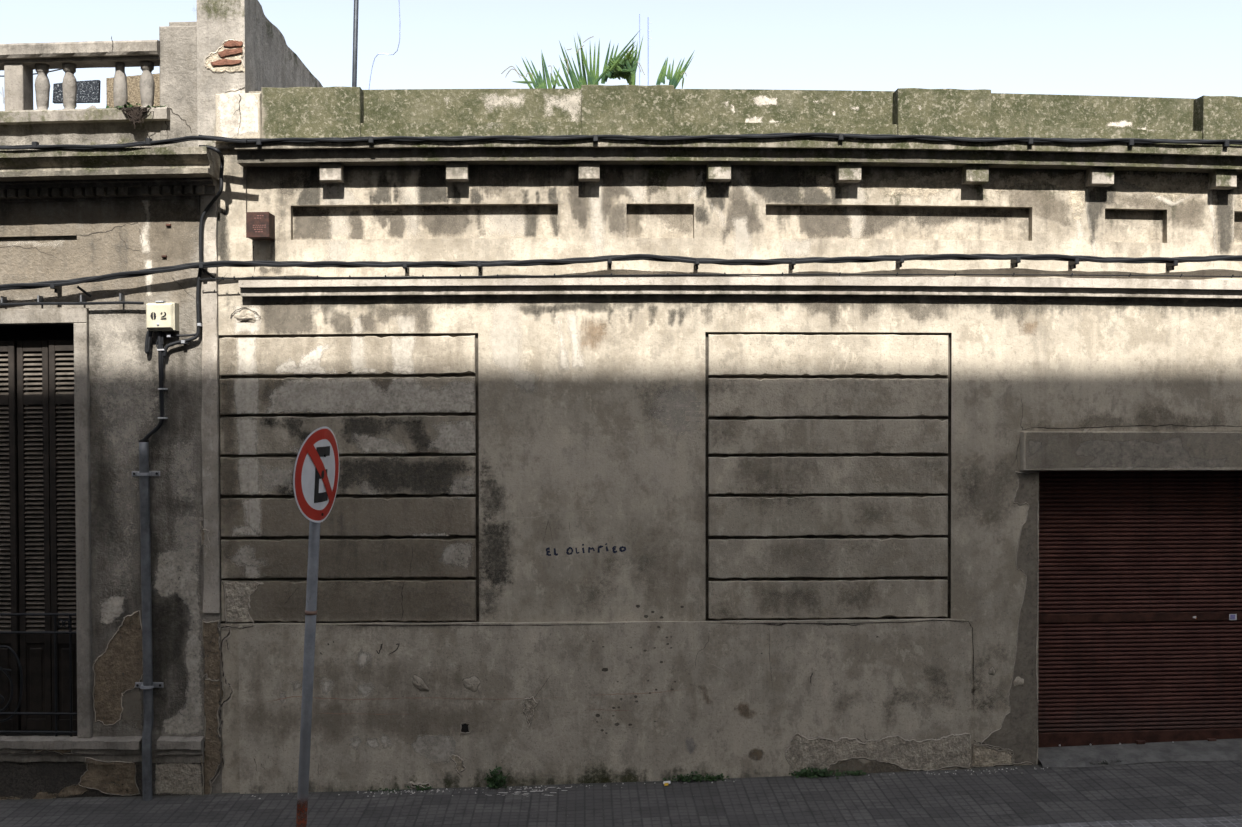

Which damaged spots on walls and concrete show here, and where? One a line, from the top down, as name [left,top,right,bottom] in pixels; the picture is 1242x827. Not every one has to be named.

flaking render [204,39,245,73]
flaking render [218,88,258,138]
leakage [278,168,405,260]
leakage [417,165,660,256]
leakage [221,301,428,533]
crack [1013,400,1242,506]
flaking render [1075,429,1226,469]
leakage [338,416,511,612]
flaking render [413,533,471,568]
flaking render [154,442,264,795]
spalling [785,471,1039,774]
spalling [0,749,140,800]